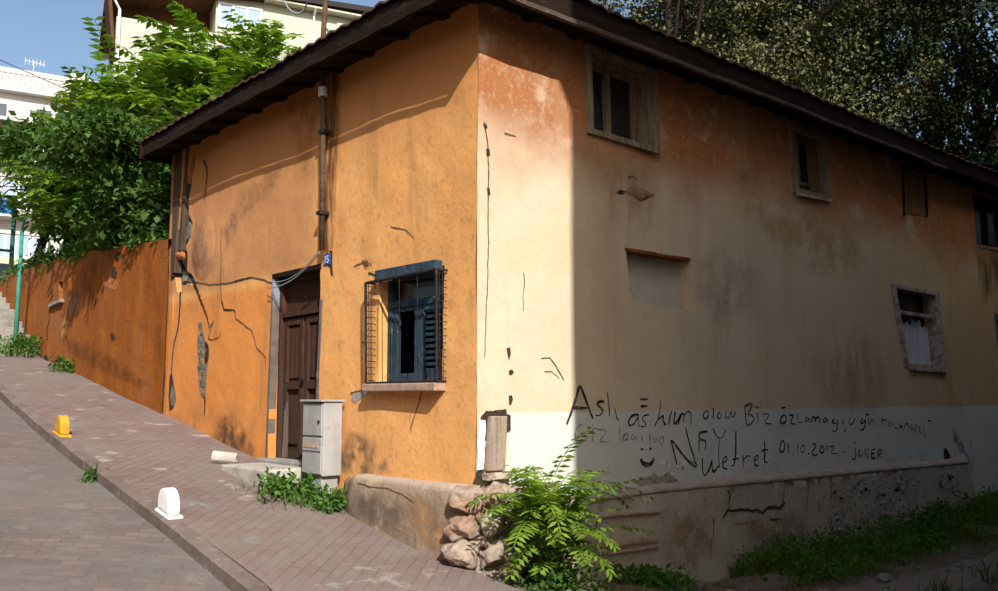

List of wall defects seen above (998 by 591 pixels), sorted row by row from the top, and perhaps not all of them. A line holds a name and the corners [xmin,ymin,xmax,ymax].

spalling [197,322,209,416]
crack [169,249,272,410]
crack [710,486,820,555]